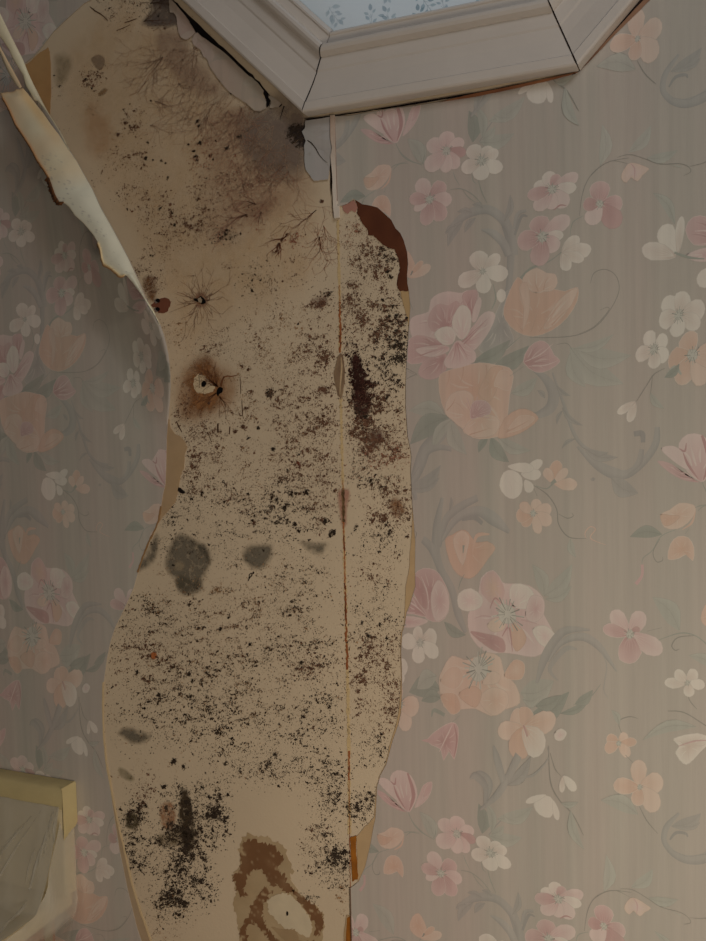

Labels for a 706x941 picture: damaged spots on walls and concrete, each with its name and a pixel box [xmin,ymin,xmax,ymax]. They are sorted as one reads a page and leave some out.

leakage [53,0,412,941]
peeling [232,832,325,941]